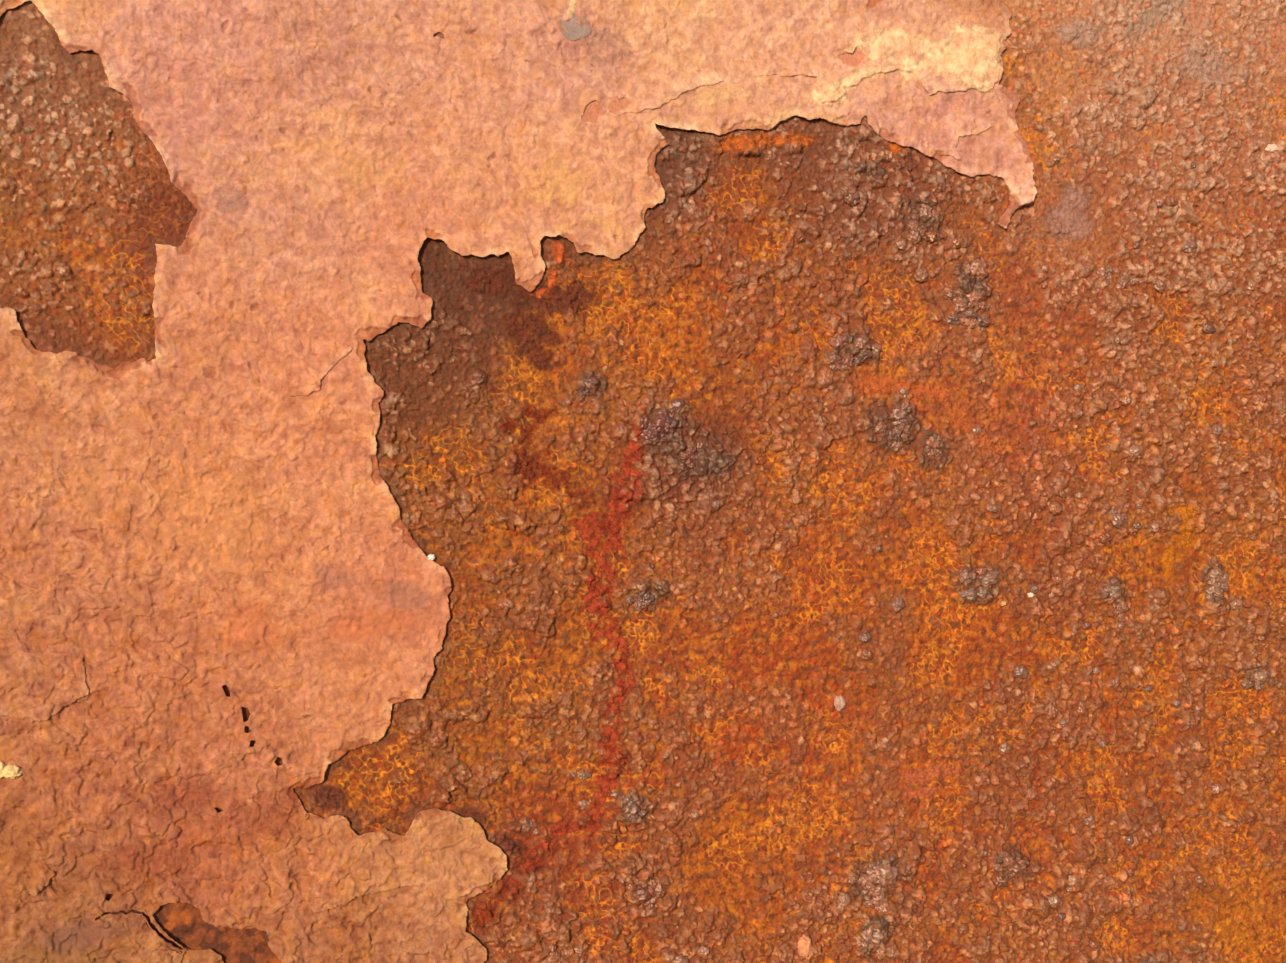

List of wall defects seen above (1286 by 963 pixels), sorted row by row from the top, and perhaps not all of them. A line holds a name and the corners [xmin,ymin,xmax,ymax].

peeling [0,1,197,369]
rust [719,133,813,151]
rust [1047,187,1088,237]
rust [469,243,594,369]
peeling [283,0,1286,963]
rust [472,406,650,928]
rust [460,807,490,825]
peeling [134,897,282,963]